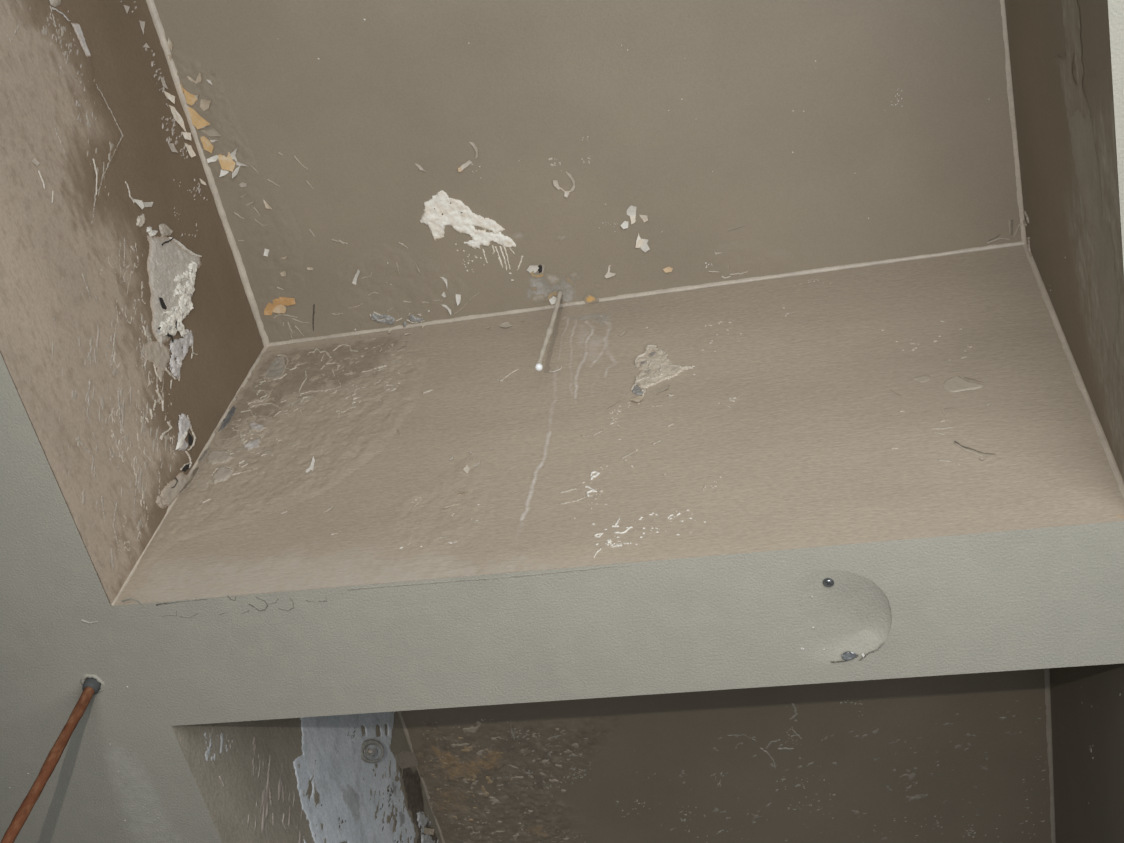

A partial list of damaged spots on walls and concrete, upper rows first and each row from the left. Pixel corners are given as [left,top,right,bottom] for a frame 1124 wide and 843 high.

peeling [0,0,202,606]
peeling [120,1,315,343]
peeling [602,205,650,252]
water stain [1054,0,1124,481]
flaking render [581,344,696,440]
peeling [560,465,612,509]
peeling [592,510,706,558]
peeling [242,705,632,843]
peeling [661,703,837,843]